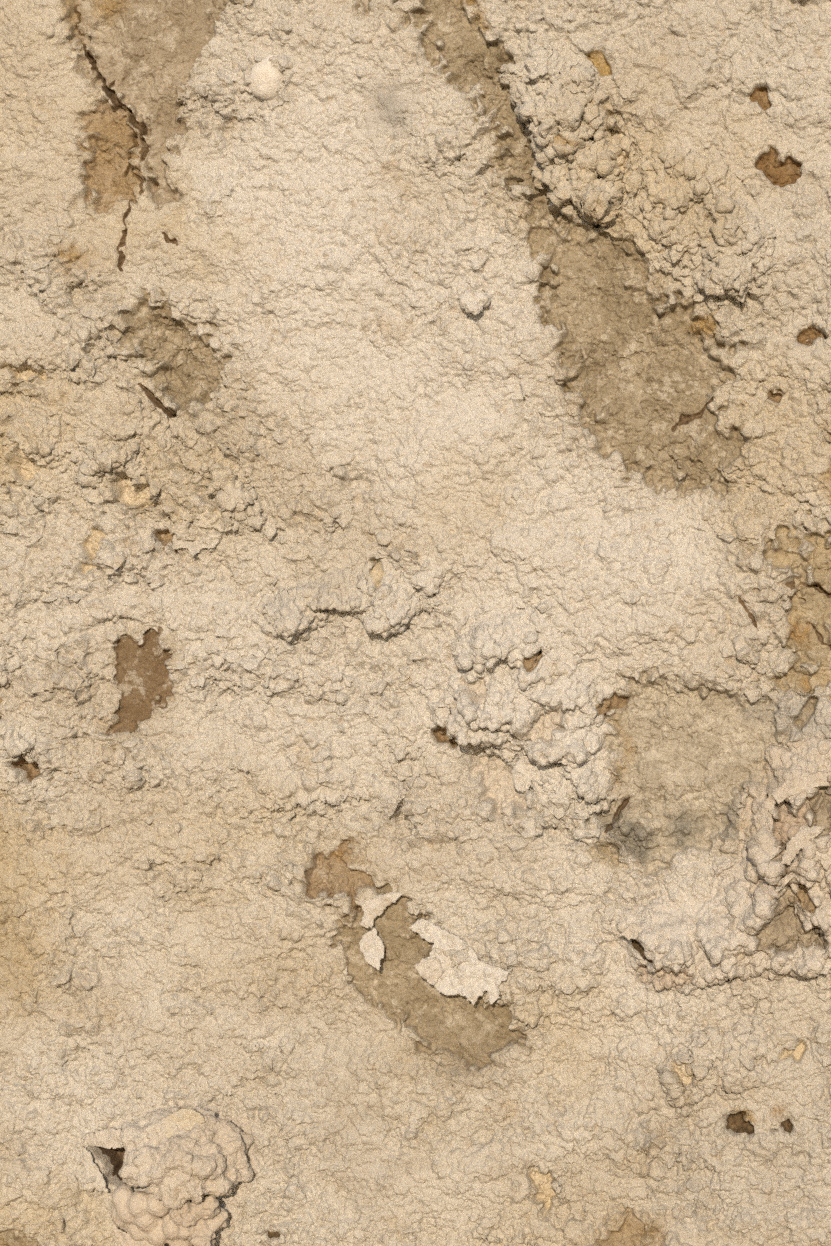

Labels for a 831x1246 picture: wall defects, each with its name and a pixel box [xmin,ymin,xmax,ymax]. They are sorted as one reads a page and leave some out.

crack [74,4,149,272]
spalling [100,628,174,747]
spalling [595,525,831,875]
crack [785,579,831,598]
crack [806,622,831,650]
spalling [305,838,534,1070]